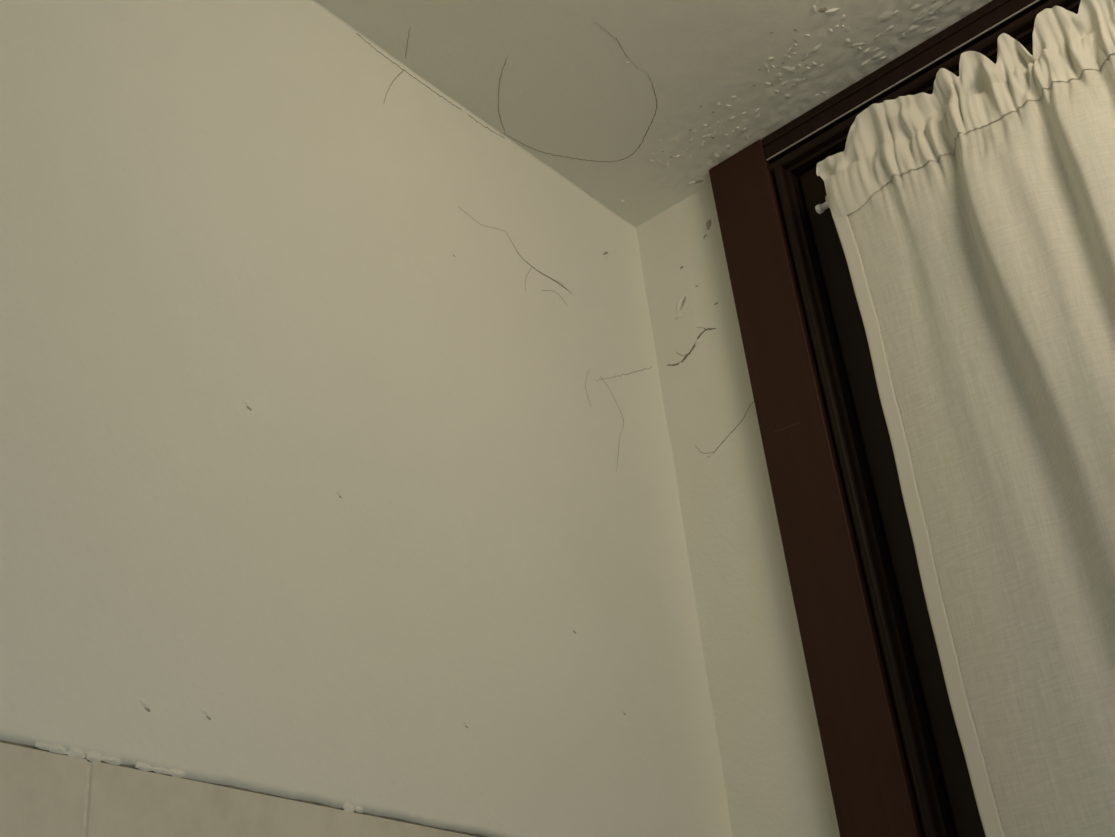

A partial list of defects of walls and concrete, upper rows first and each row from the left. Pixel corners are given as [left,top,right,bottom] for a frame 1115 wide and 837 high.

crack [356,22,657,162]
crack [585,327,716,466]
crack [695,401,754,458]